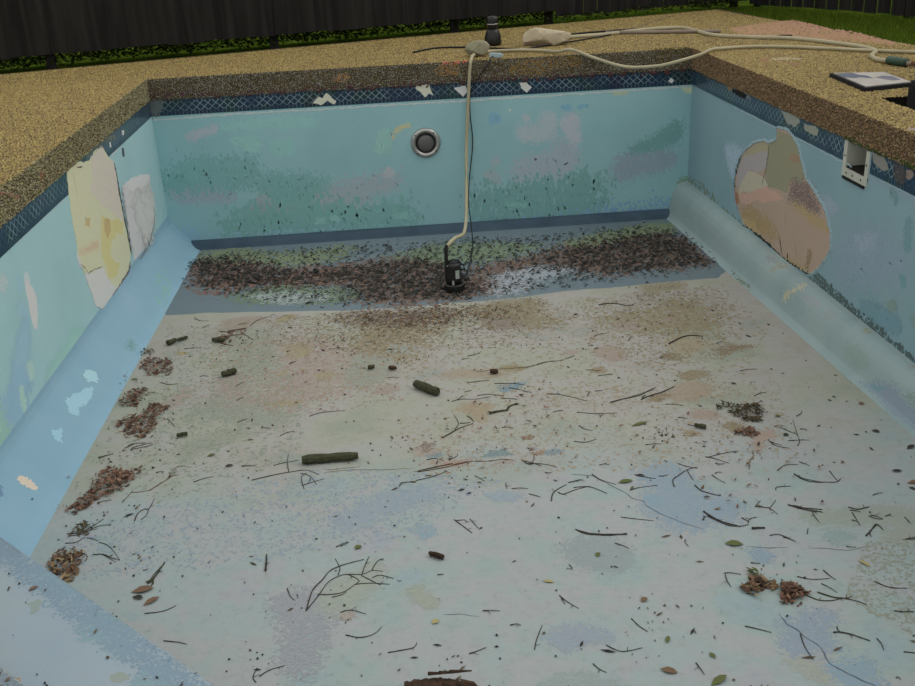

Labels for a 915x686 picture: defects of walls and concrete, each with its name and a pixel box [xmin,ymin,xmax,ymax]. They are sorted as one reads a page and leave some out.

spalling [67,142,131,309]
spalling [722,110,833,277]